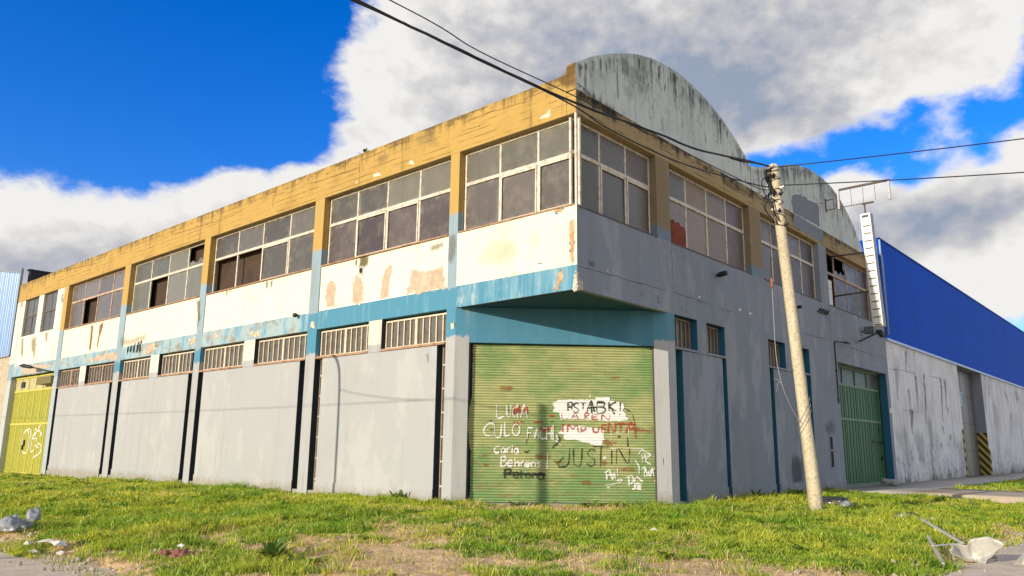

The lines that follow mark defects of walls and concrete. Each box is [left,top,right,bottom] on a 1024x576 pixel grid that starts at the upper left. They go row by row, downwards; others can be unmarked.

damp [559,63,616,116]
peeling [553,205,584,292]
peeling [325,281,336,310]
peeling [352,266,364,305]
peeling [379,265,393,299]
peeling [406,265,446,295]